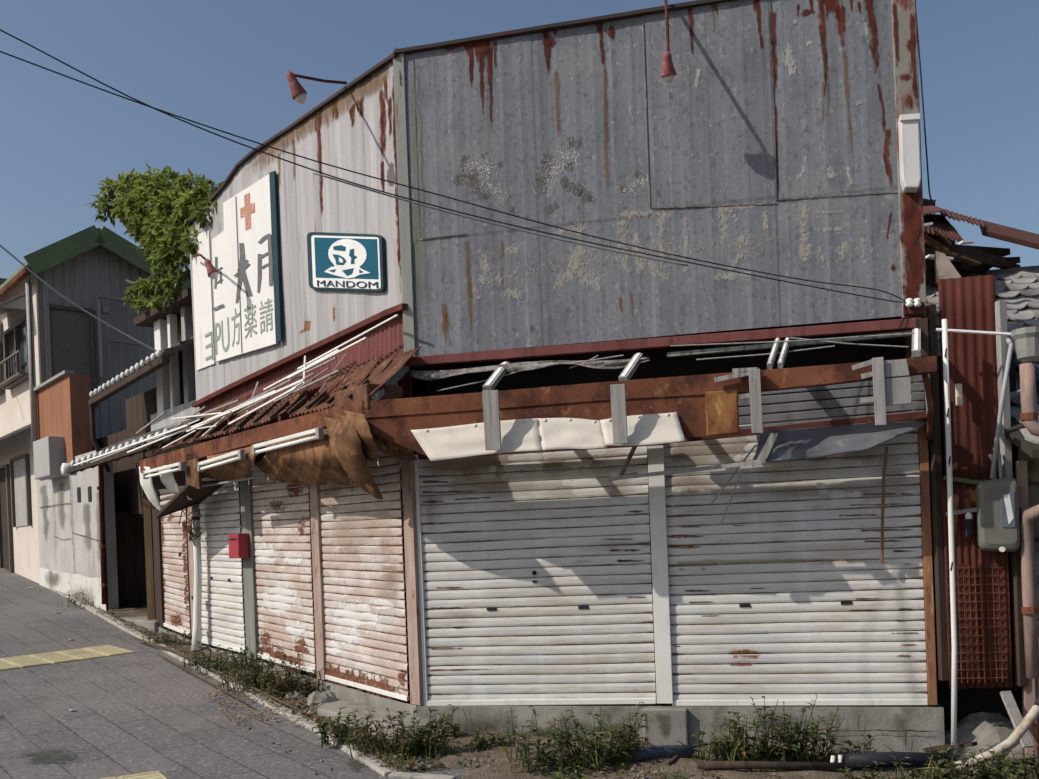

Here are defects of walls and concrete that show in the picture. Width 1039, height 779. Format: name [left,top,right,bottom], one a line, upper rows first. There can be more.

corrosion [446,36,513,122]
corrosion [753,0,777,89]
corrosion [892,4,917,108]
corrosion [314,98,363,214]
corrosion [379,48,401,274]
peeling [460,145,516,215]
peeling [537,131,595,216]
corrosion [886,189,926,300]
peeling [254,543,303,565]
corrosion [259,631,309,671]
peeling [284,621,307,637]
peeling [370,599,394,610]